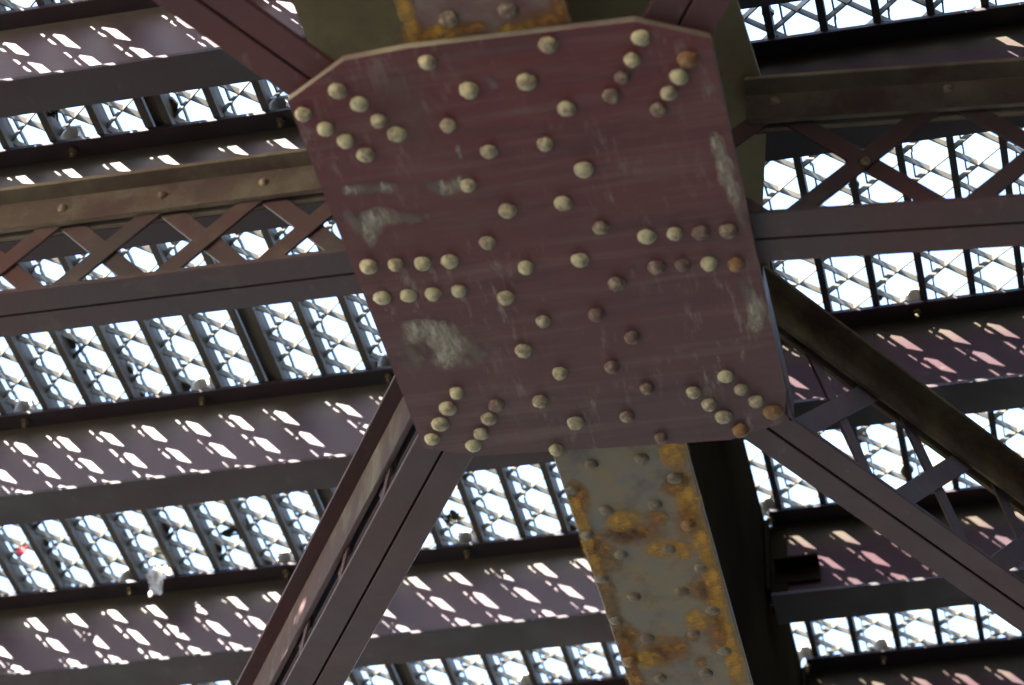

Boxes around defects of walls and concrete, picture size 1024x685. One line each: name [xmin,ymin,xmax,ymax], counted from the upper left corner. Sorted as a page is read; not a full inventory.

rust [396,0,485,42]
rust [499,0,568,32]
peeling [349,209,419,240]
peeling [405,321,485,367]
rust [569,443,744,685]